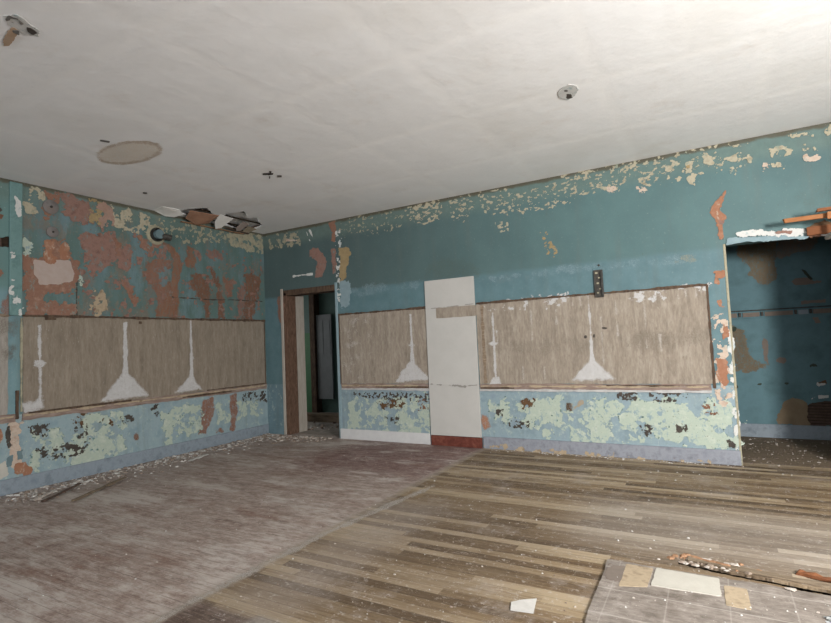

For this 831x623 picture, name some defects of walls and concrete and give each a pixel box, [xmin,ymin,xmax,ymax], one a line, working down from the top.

spalling [3,14,40,46]
peeling [762,132,821,172]
peeling [710,190,831,285]
flaking render [0,186,267,480]
flaking render [309,140,753,433]
flaking render [476,270,786,457]
peeling [776,398,811,425]